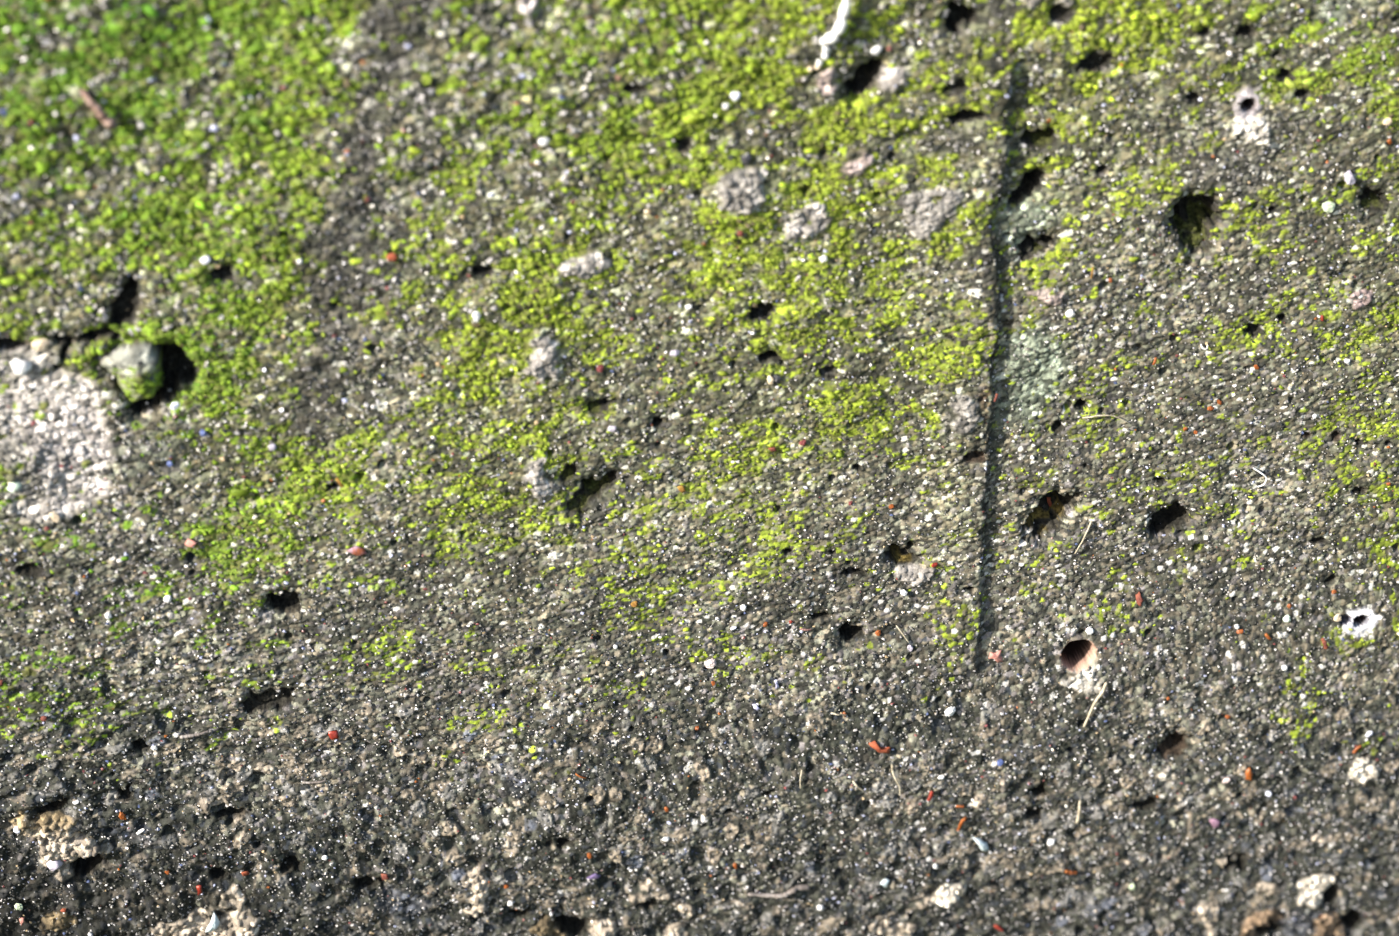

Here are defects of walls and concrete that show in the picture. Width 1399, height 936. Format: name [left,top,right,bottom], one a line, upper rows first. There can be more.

damp [270,0,474,453]
damp [923,0,1041,495]
damp [1148,121,1291,214]
damp [114,408,193,494]
damp [953,569,1000,687]